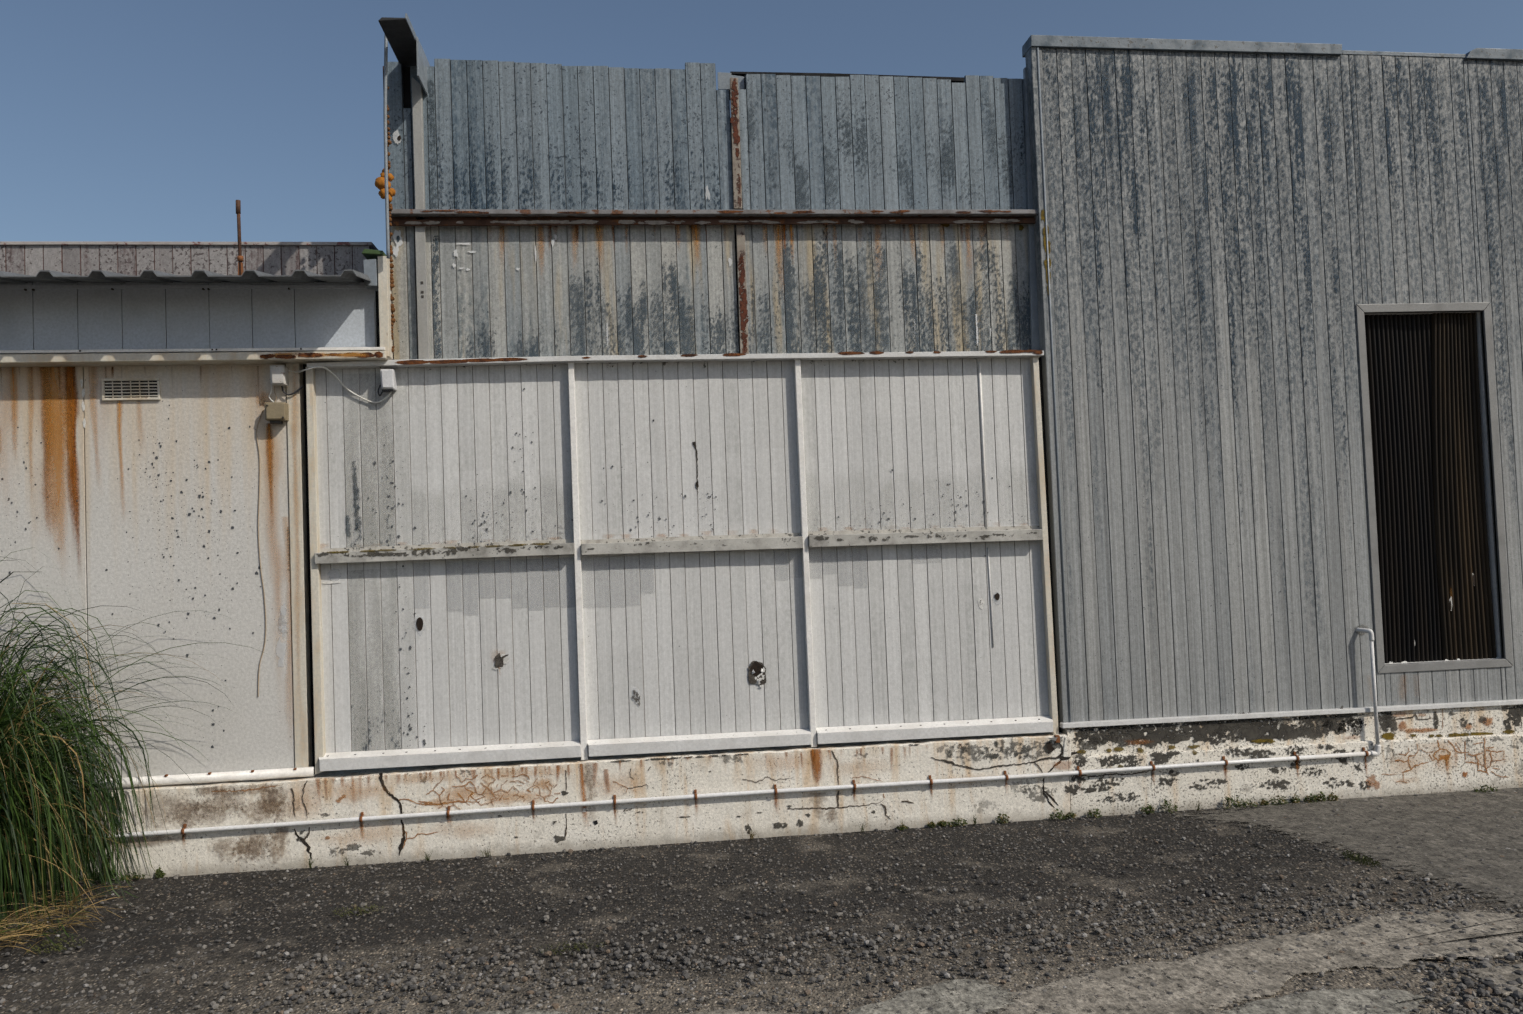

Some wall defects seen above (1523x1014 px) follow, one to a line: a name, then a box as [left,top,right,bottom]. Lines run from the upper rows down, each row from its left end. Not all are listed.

damp [427,80,720,209]
corrosion [717,78,743,213]
damp [748,83,1025,210]
damp [428,229,1031,371]
corrosion [723,254,749,356]
damp [1043,50,1523,460]
corrosion [11,367,79,531]
damp [601,476,726,546]
spalling [751,661,765,687]
crack [379,770,569,856]
corrosion [557,763,608,816]
crack [931,755,1152,808]